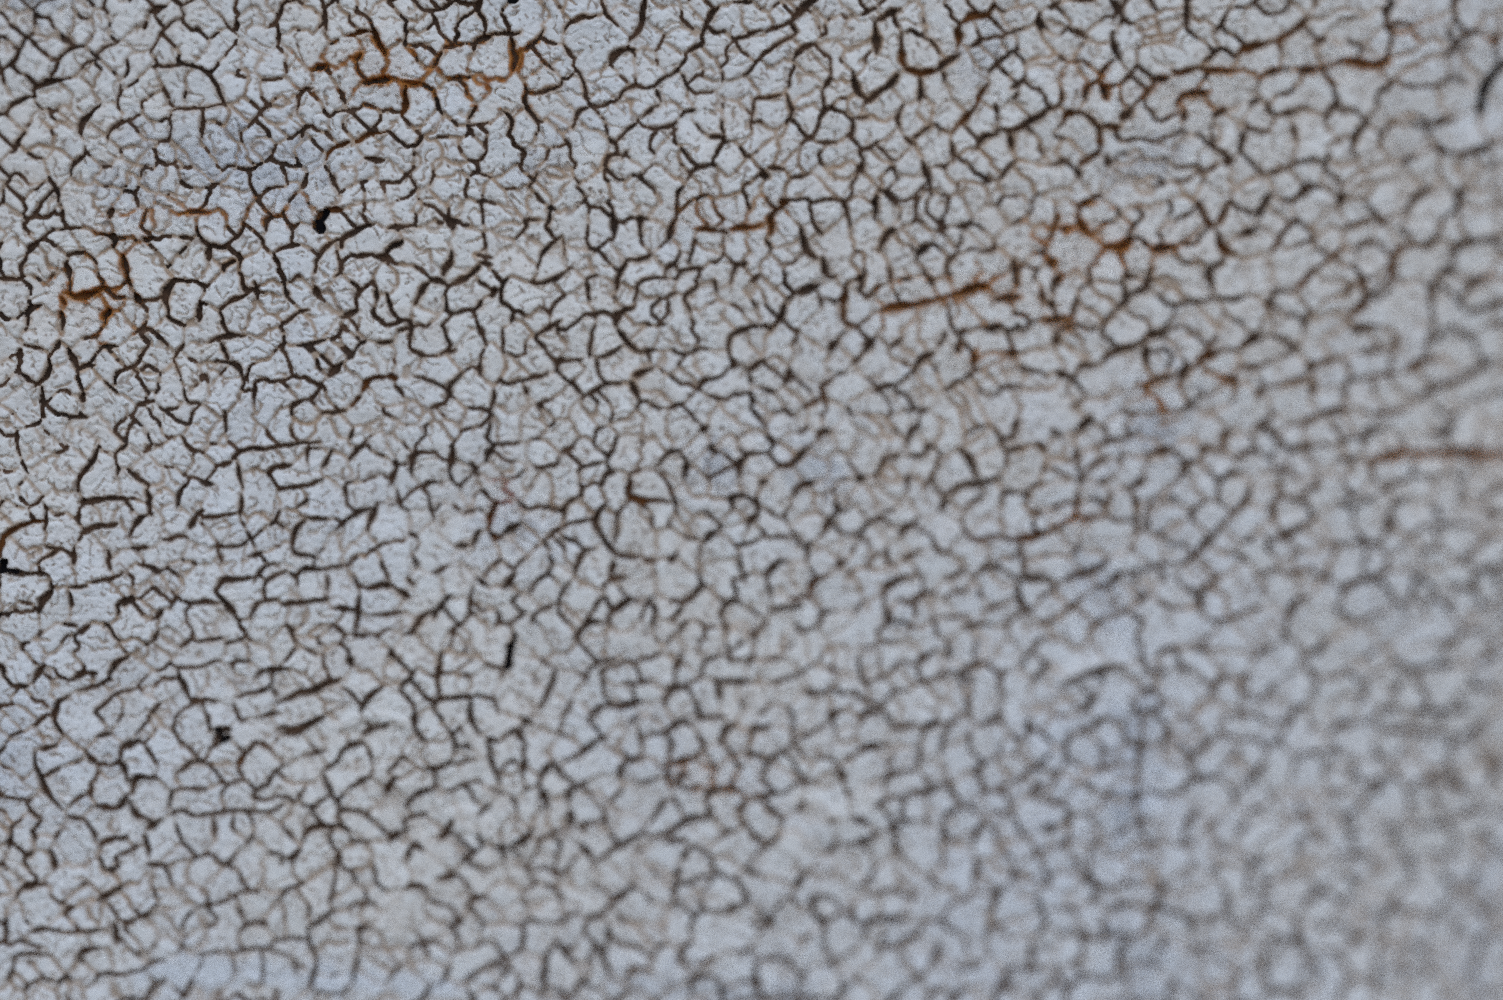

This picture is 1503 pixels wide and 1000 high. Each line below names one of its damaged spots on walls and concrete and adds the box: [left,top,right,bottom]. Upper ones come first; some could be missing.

corrosion [309,22,540,111]
crack [1444,0,1502,67]
crack [1400,116,1497,169]
corrosion [1025,201,1194,283]
crack [0,0,1468,648]
corrosion [882,274,1020,322]
crack [88,236,1503,1000]
crack [0,622,131,736]
crack [0,730,24,770]
crack [33,703,175,886]
crack [0,790,102,982]
crack [24,973,74,1000]